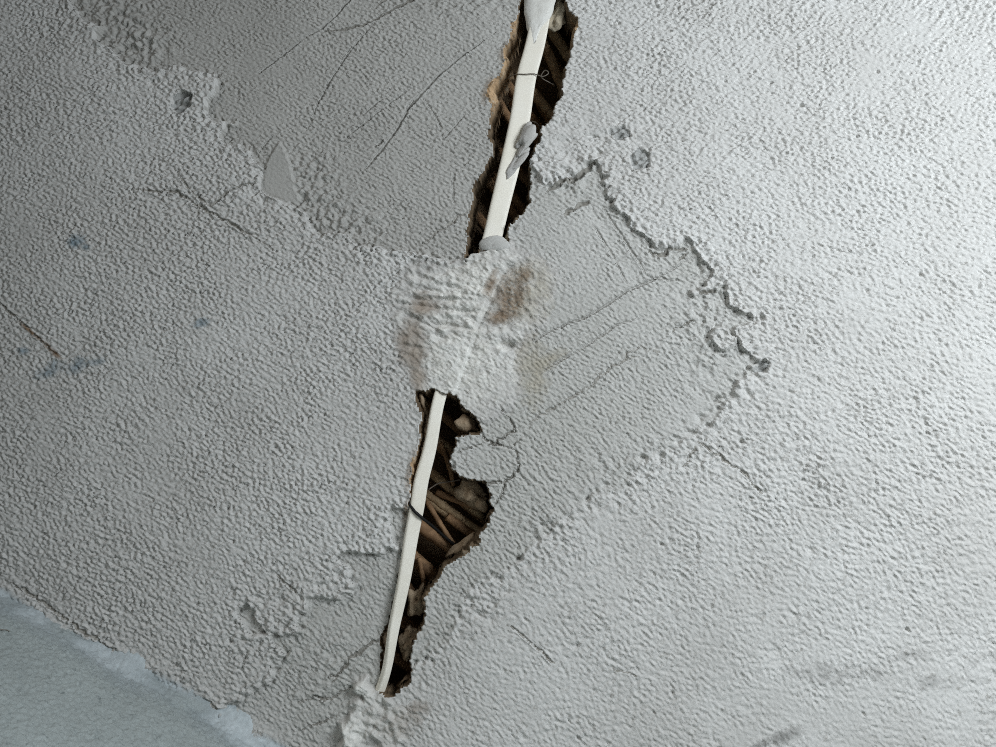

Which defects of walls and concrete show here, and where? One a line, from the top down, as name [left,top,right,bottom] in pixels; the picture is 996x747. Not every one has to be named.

crack [325,0,414,32]
spalling [69,0,521,262]
crack [134,175,273,250]
crack [0,302,62,359]
damp [487,279,534,322]
crack [699,288,718,296]
spalling [409,160,770,667]
crack [298,319,695,730]